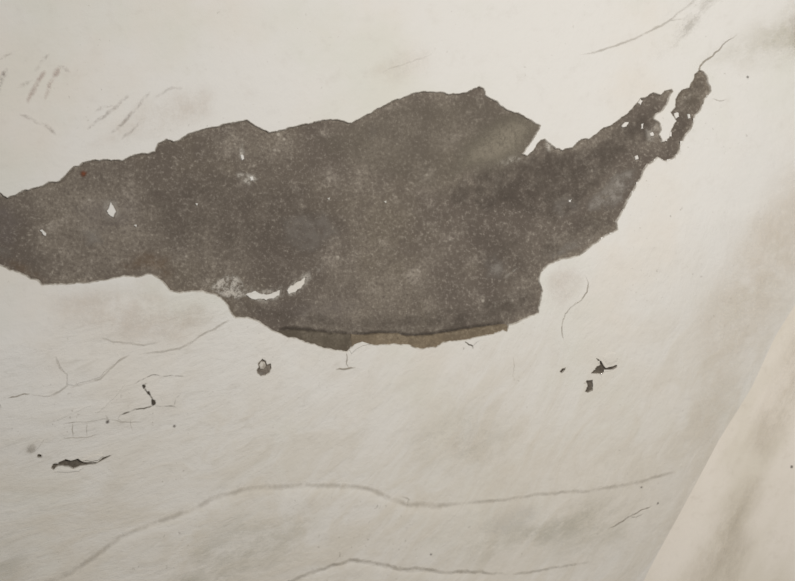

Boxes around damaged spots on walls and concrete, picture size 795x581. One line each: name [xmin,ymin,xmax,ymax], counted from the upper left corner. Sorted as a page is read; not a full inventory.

flaking render [0,70,712,354]
peeling [256,359,272,376]
peeling [584,352,619,393]
peeling [51,455,112,473]